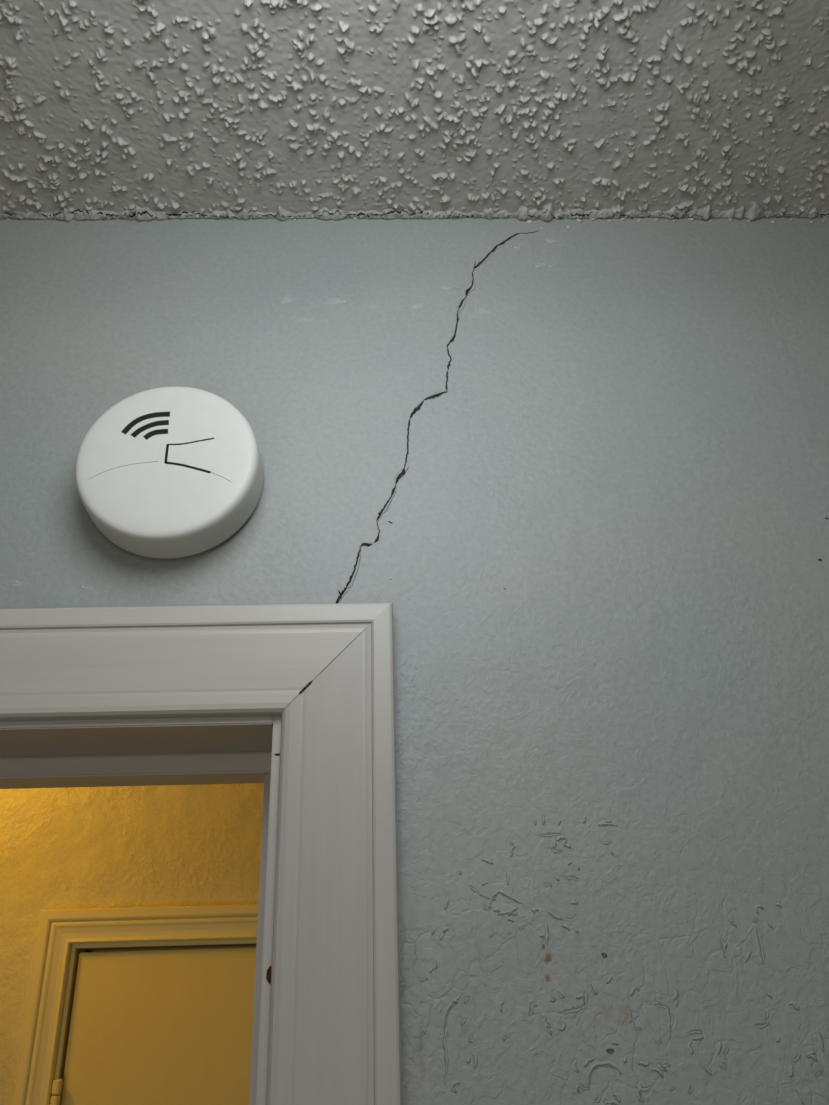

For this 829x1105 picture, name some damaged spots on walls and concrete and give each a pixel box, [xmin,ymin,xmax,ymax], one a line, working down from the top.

crack [336,210,703,604]